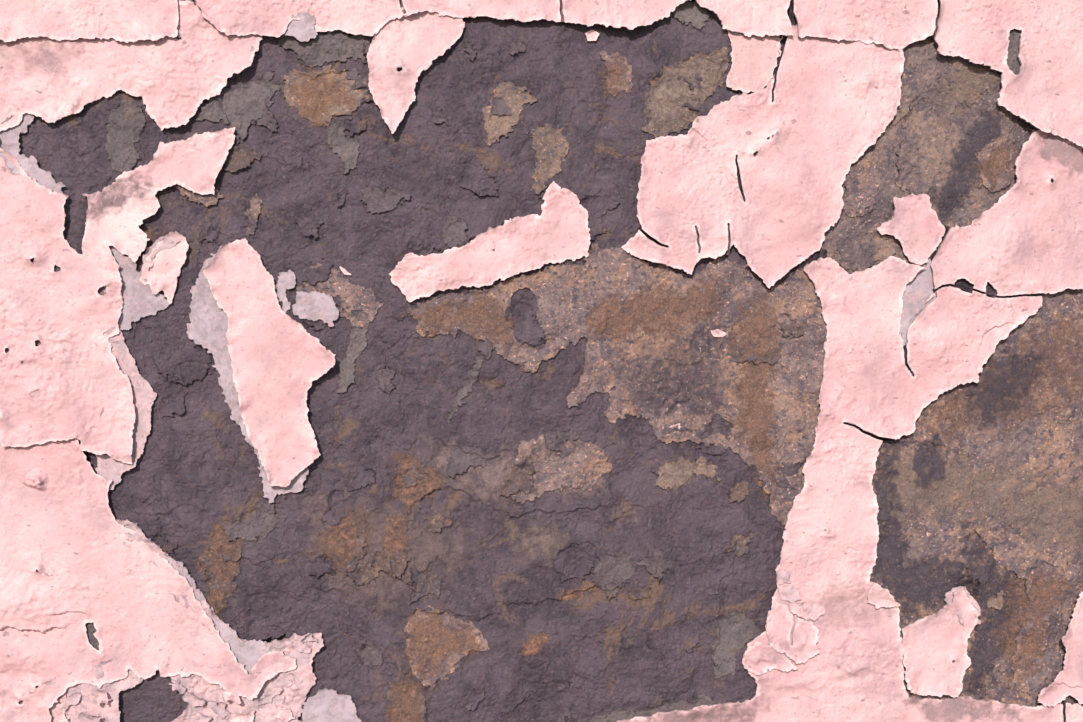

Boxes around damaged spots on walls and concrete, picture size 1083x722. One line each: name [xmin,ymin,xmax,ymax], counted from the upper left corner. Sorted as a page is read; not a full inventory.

crack [557,0,565,22]
crack [772,0,795,102]
peeling [1006,27,1024,75]
peeling [820,36,1039,346]
crack [930,225,950,260]
crack [932,284,1042,298]
peeling [0,0,828,722]
crack [901,334,914,376]
crack [843,422,893,442]
peeling [870,288,1083,707]